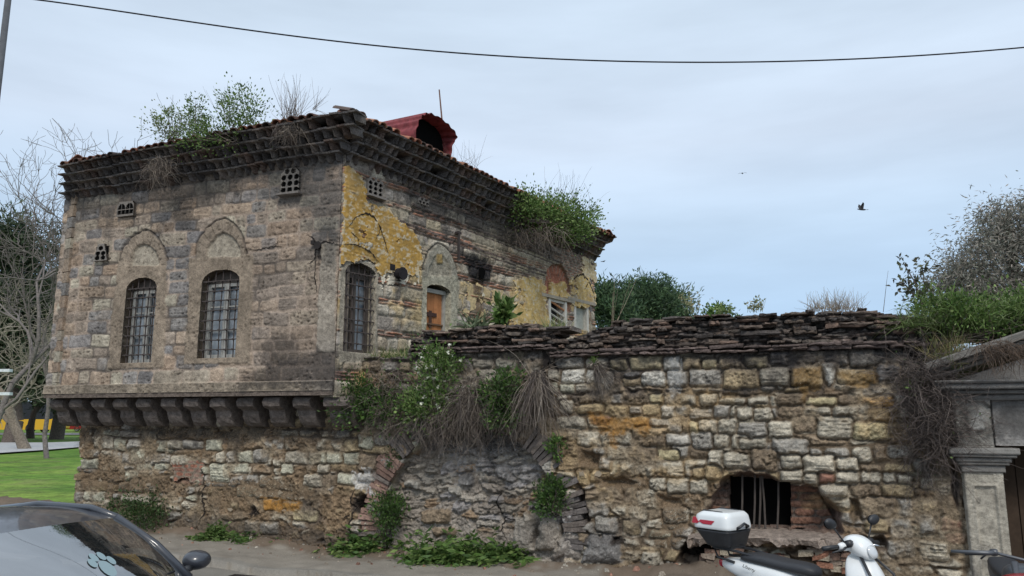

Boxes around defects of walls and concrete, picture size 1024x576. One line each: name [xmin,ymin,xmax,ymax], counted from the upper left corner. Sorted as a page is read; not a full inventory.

crack [309,212,388,292]
peeling [340,165,423,289]
peeling [459,256,597,326]